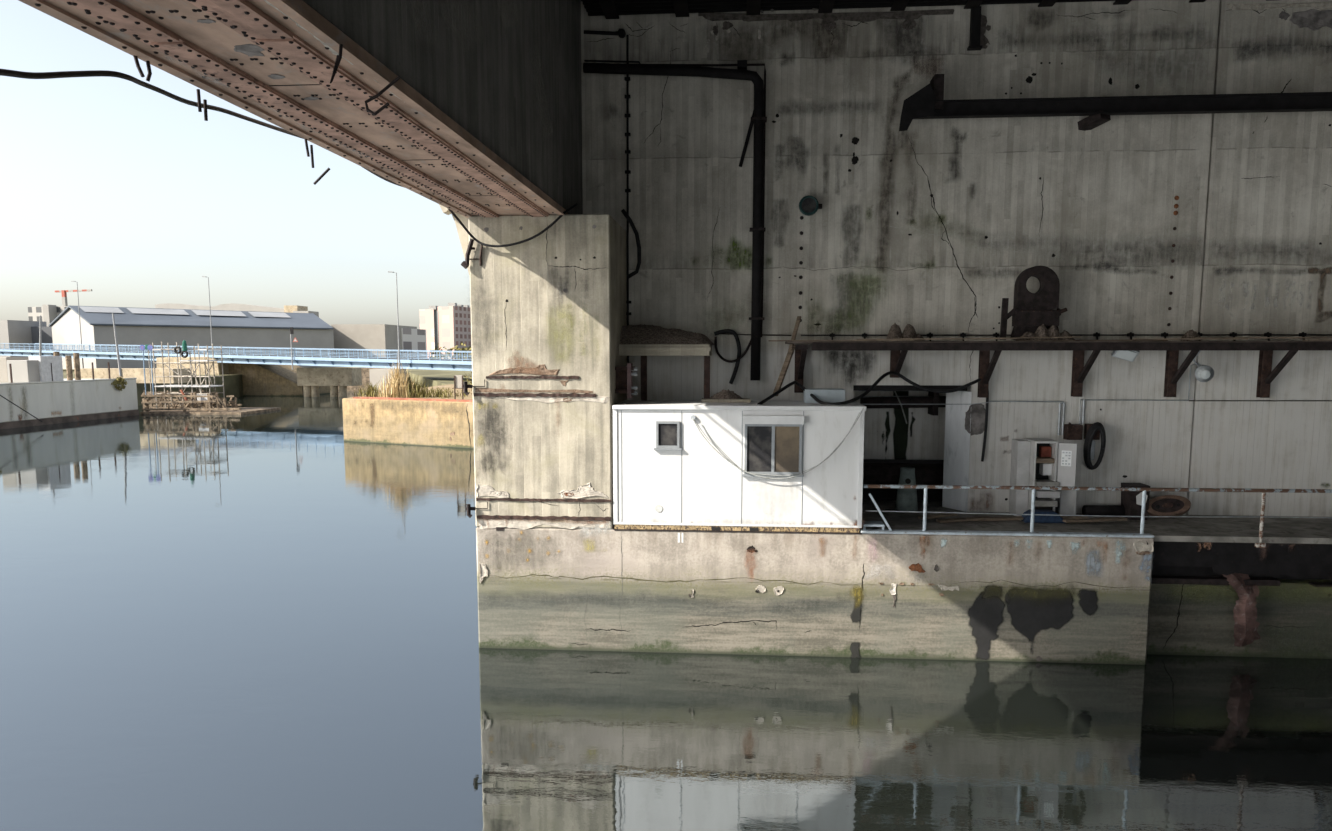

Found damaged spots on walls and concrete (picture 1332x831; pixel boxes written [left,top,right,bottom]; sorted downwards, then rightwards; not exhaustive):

crack [784,137,978,380]
water stain [968,586,1098,660]